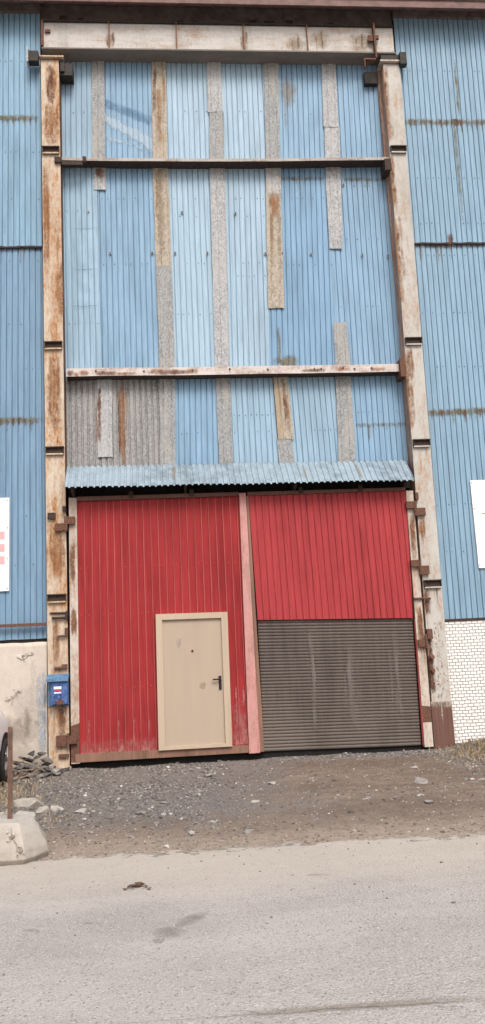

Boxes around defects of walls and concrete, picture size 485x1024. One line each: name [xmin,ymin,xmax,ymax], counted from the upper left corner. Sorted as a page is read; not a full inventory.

rust [46,67,58,137]
rust [408,67,485,193]
rust [35,175,62,311]
rust [118,389,127,459]
rust [431,408,484,418]
rust [418,589,438,690]